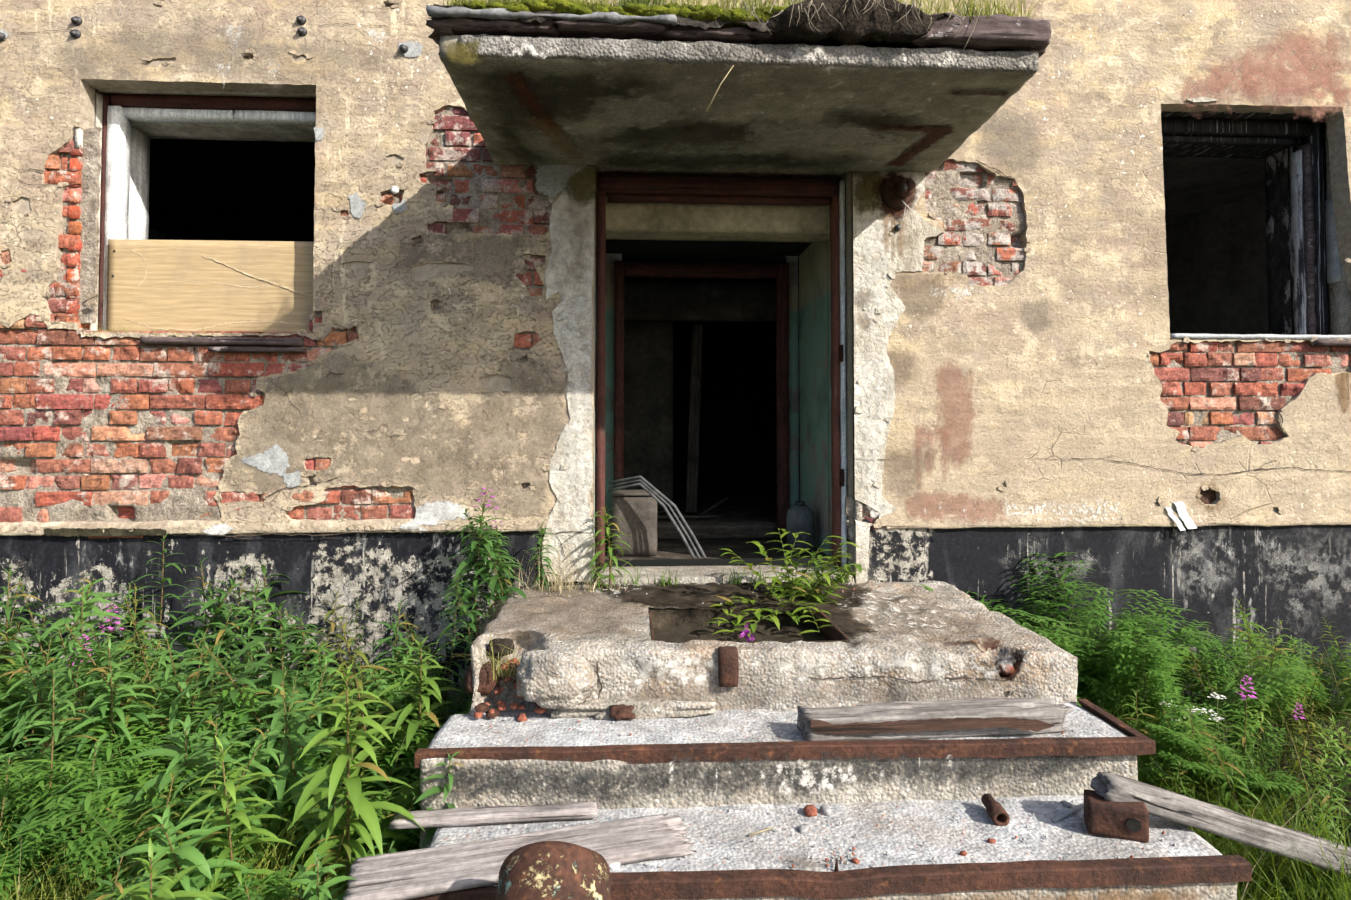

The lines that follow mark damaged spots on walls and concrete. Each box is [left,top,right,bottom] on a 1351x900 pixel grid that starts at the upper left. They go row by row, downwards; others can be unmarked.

spalling [922,160,1033,286]
spalling [0,106,593,719]
spalling [1147,336,1351,452]
crack [1027,444,1351,502]
water stain [1019,542,1093,580]
water stain [1176,538,1226,590]
water stain [1266,548,1351,609]